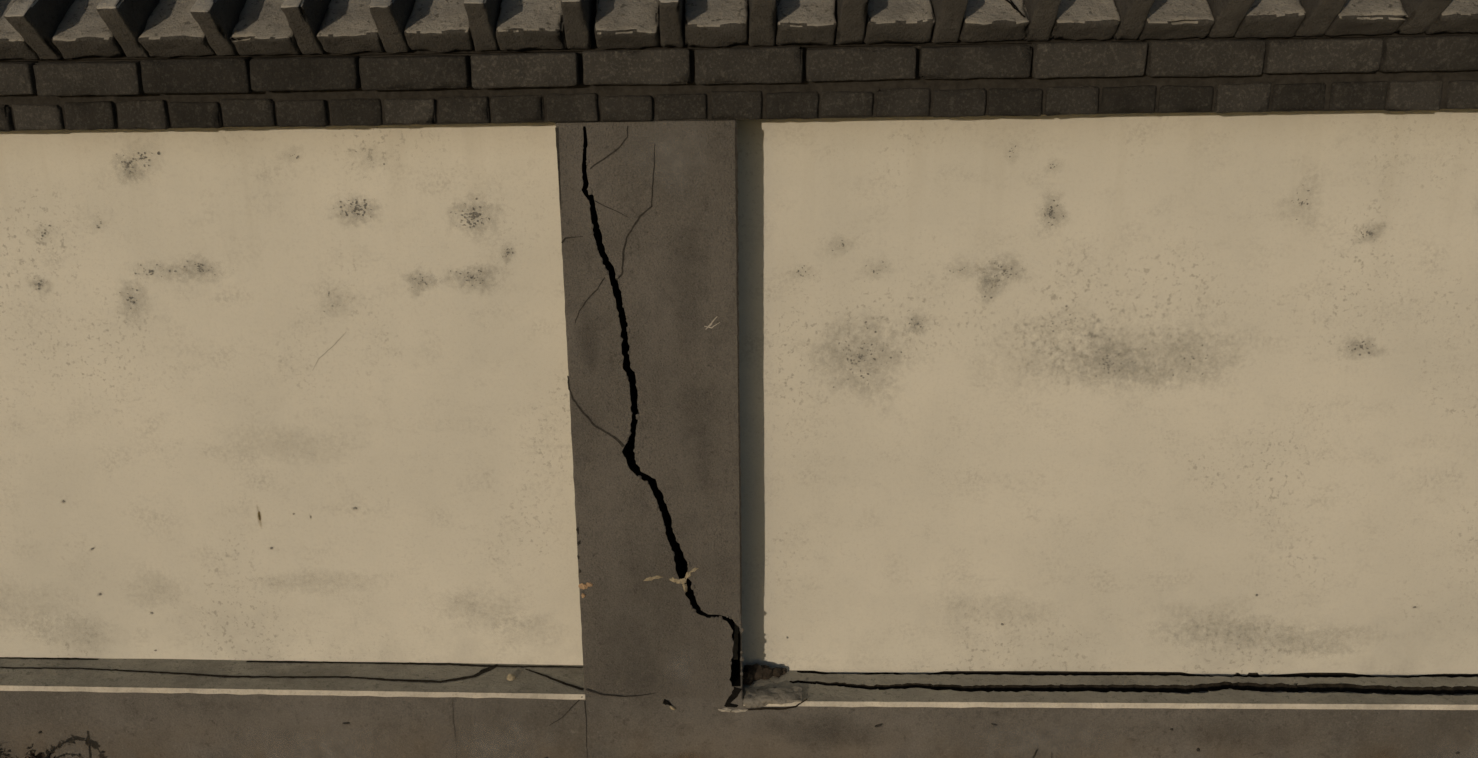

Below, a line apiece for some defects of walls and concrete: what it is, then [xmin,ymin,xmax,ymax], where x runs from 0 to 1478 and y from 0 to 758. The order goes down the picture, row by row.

crack [555,126,1478,711]